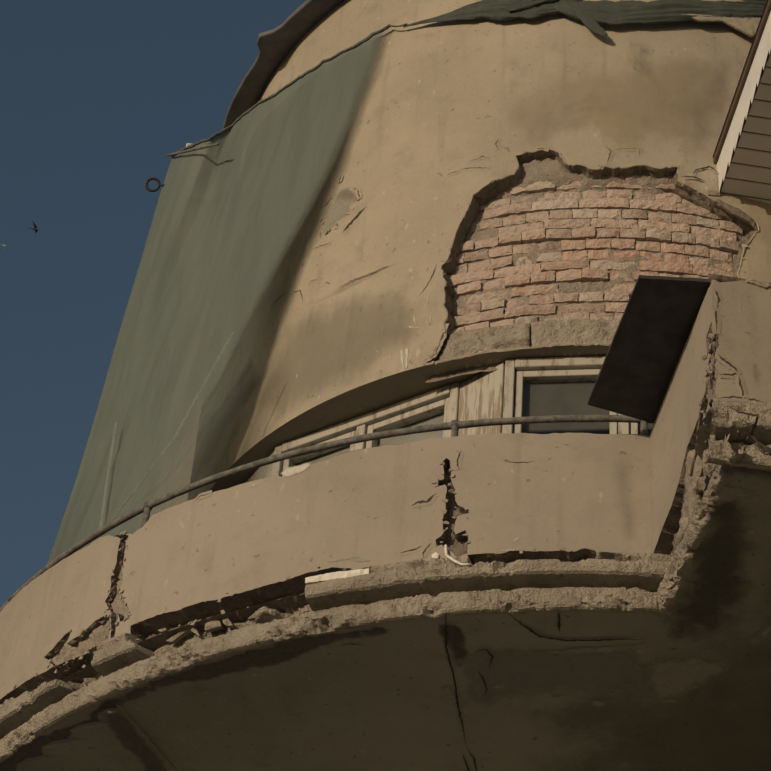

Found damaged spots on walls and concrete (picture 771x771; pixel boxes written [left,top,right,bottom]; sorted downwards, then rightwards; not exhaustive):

flaking render [423,147,771,383]
spalling [0,533,354,704]
spalling [432,459,471,546]
crack [445,616,478,771]
spalling [467,547,601,565]
crack [512,611,638,641]
spalling [654,323,726,561]
water stain [678,485,751,633]
crack [710,280,771,452]